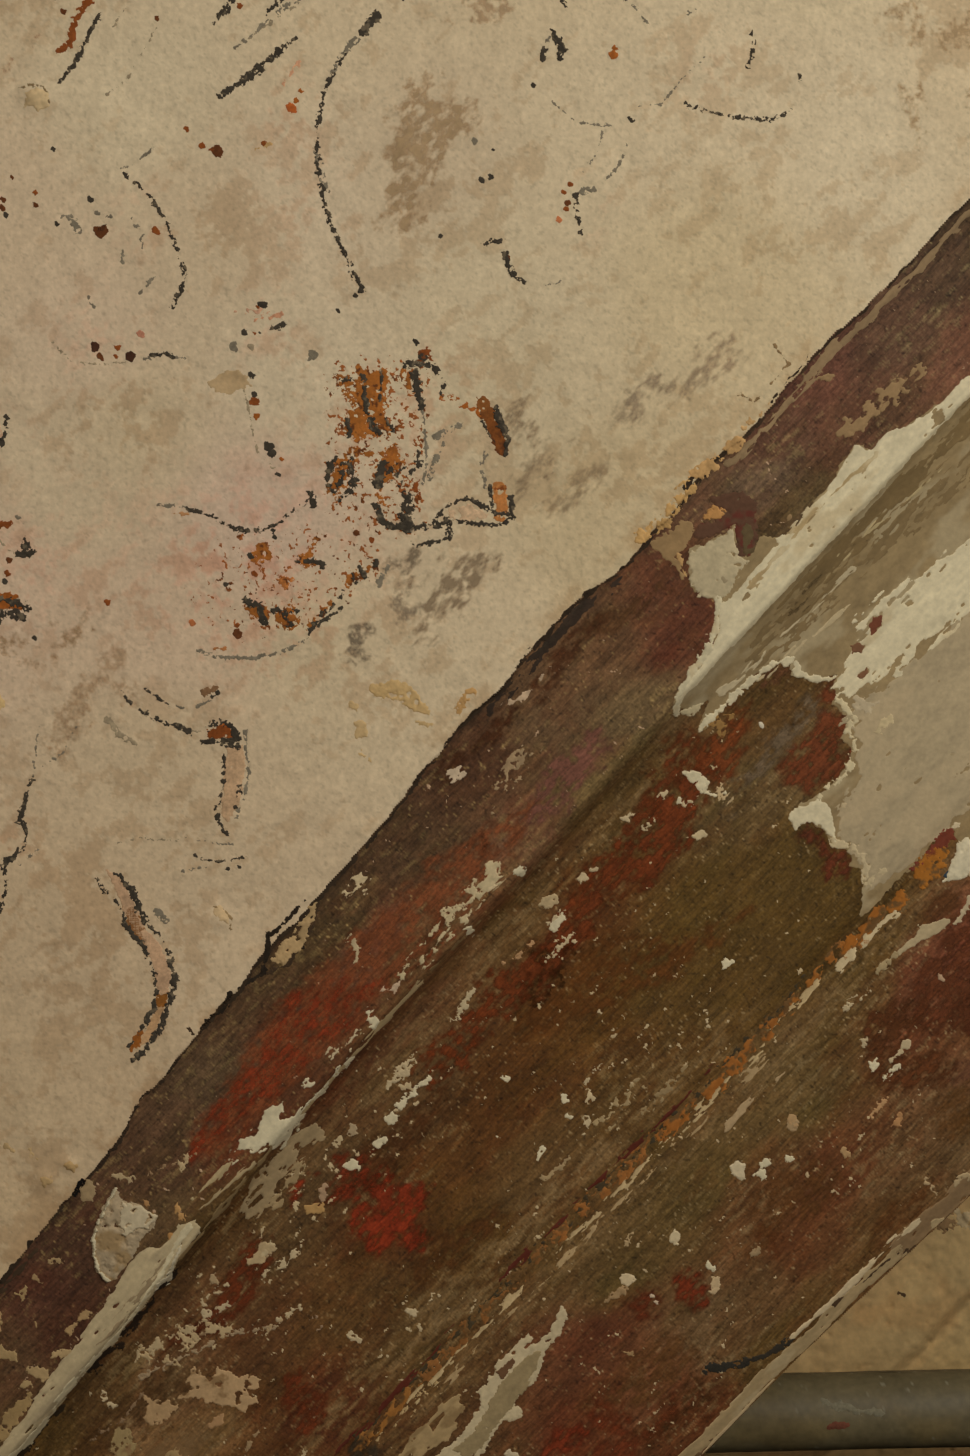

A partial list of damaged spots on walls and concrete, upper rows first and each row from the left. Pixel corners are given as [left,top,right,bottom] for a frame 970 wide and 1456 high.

peeling [650,362,970,1012]
peeling [620,813,656,831]
peeling [577,867,599,883]
peeling [502,893,578,965]
peeling [860,1037,911,1127]
peeling [724,1072,785,1132]
peeling [786,1114,799,1131]
peeling [0,860,527,1456]
peeling [729,1155,795,1181]
peeling [669,1229,681,1245]
peeling [604,1273,637,1303]
peeling [706,1260,721,1294]